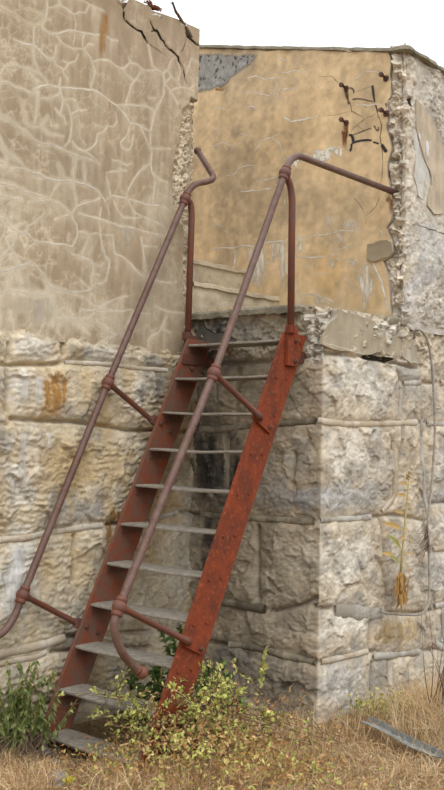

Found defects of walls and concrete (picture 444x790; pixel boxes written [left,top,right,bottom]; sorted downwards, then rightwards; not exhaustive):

crack [0,0,199,340]
spalling [172,98,196,347]
crack [211,49,391,313]
spalling [300,42,444,365]
corrosion [45,373,67,404]